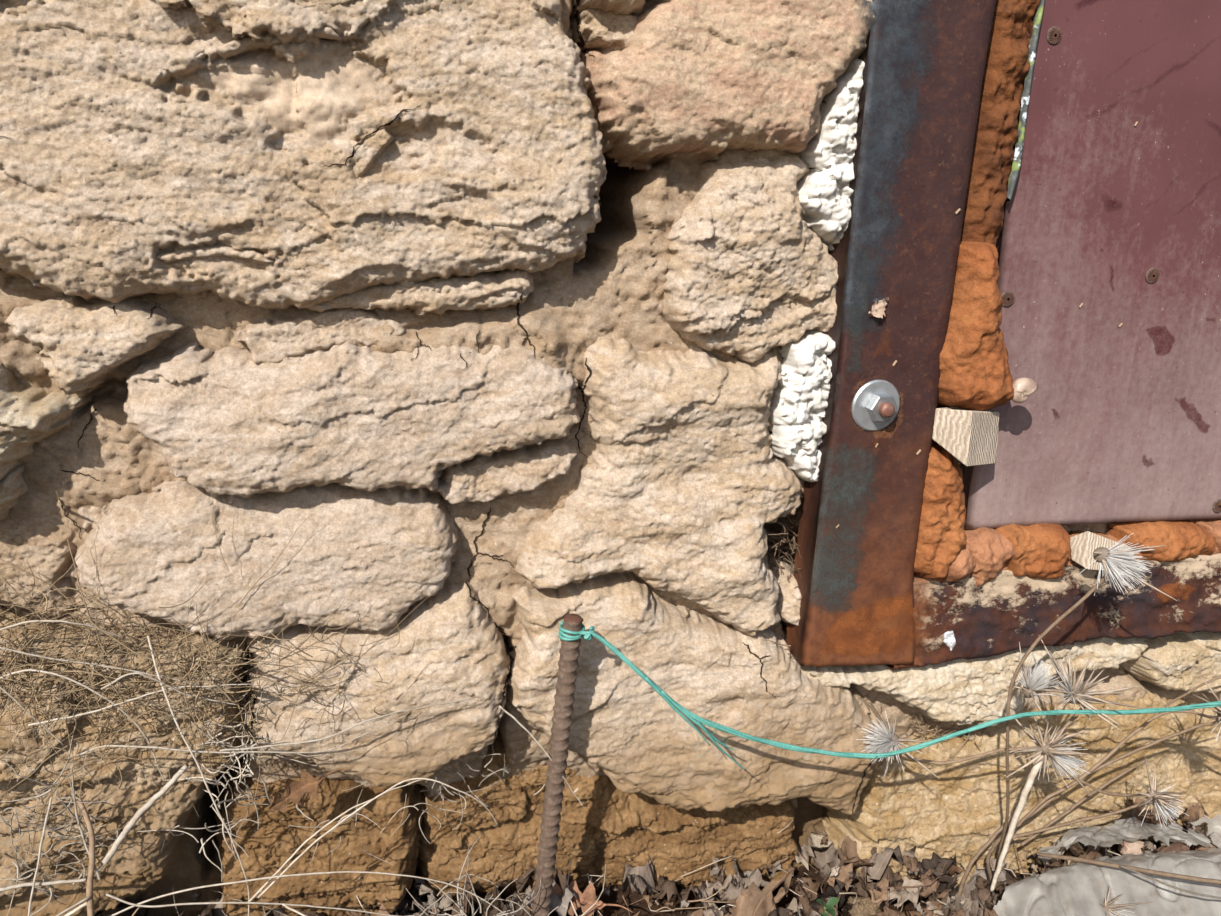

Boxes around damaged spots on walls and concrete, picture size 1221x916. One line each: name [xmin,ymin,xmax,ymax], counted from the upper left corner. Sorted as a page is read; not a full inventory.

crack [572,0,595,57]
crack [465,507,516,750]